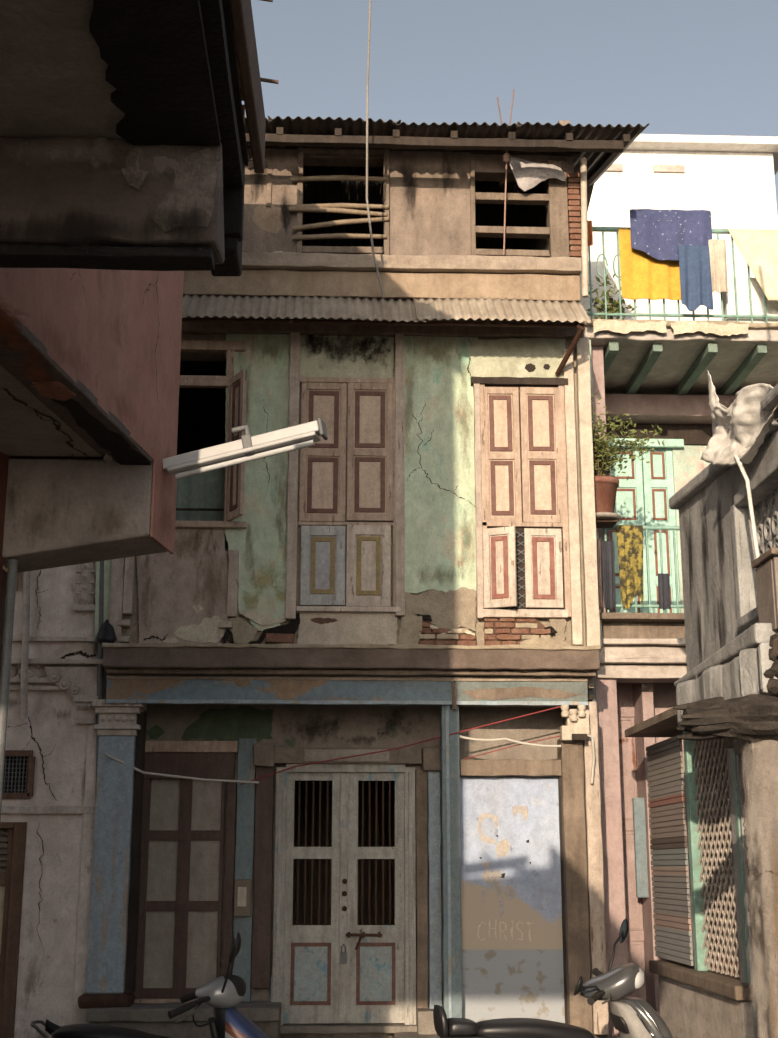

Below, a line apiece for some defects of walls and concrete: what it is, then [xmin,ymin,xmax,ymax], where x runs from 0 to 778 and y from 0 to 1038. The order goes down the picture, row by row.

spalling [89,0,221,233]
leakage [282,199,290,229]
leakage [405,173,416,202]
leakage [307,334,389,361]
crack [3,388,91,459]
crack [407,404,475,506]
peeling [397,587,566,646]
crack [8,717,58,801]
crack [36,827,44,958]
peeling [478,813,517,918]